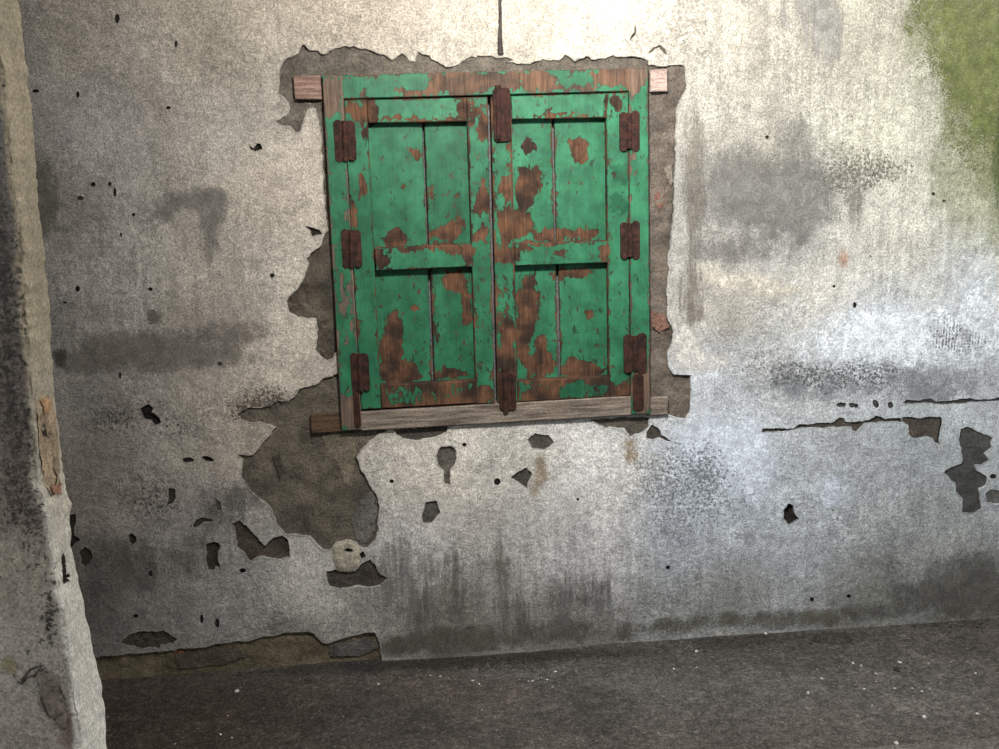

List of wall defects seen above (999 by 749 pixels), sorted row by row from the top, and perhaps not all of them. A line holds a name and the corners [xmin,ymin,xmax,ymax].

damp [776,0,843,64]
spalling [275,43,693,421]
spalling [526,433,555,450]
spalling [589,415,650,438]
spalling [231,373,466,590]
spalling [494,467,533,488]
spalling [943,425,999,514]
spalling [192,499,222,530]
spalling [783,503,800,527]
spalling [69,512,93,568]
spalling [205,541,221,571]